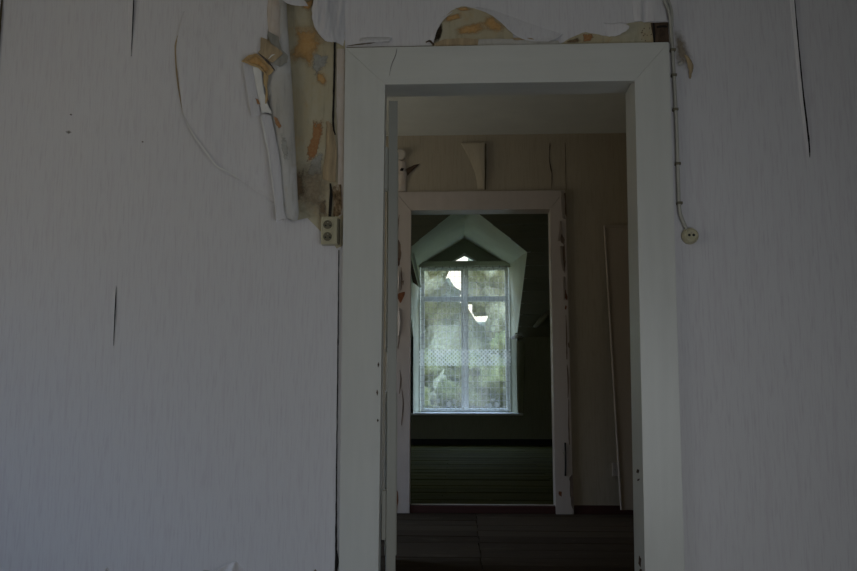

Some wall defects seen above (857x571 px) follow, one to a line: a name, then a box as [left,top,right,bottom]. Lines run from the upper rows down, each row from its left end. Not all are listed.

crack [0,0,8,33]
crack [127,0,135,56]
flaking render [561,21,653,44]
crack [789,0,810,157]
flaking render [287,0,345,248]
crack [109,288,117,346]